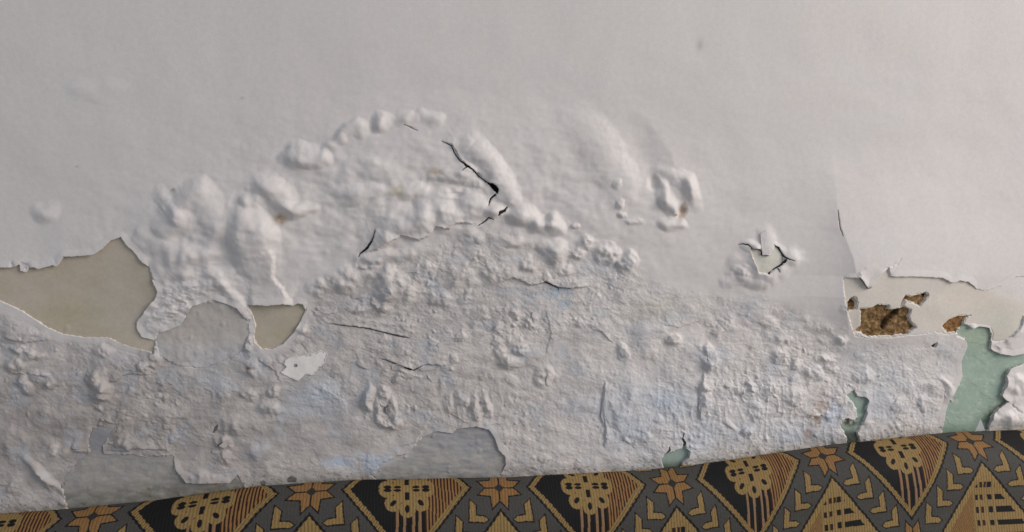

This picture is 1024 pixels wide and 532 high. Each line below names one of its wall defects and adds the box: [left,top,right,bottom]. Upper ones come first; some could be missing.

crack [444,142,507,226]
crack [742,243,794,274]
peeling [0,231,308,368]
peeling [843,268,1024,433]
peeling [840,390,873,443]
peeling [372,421,511,479]
peeling [661,445,693,468]